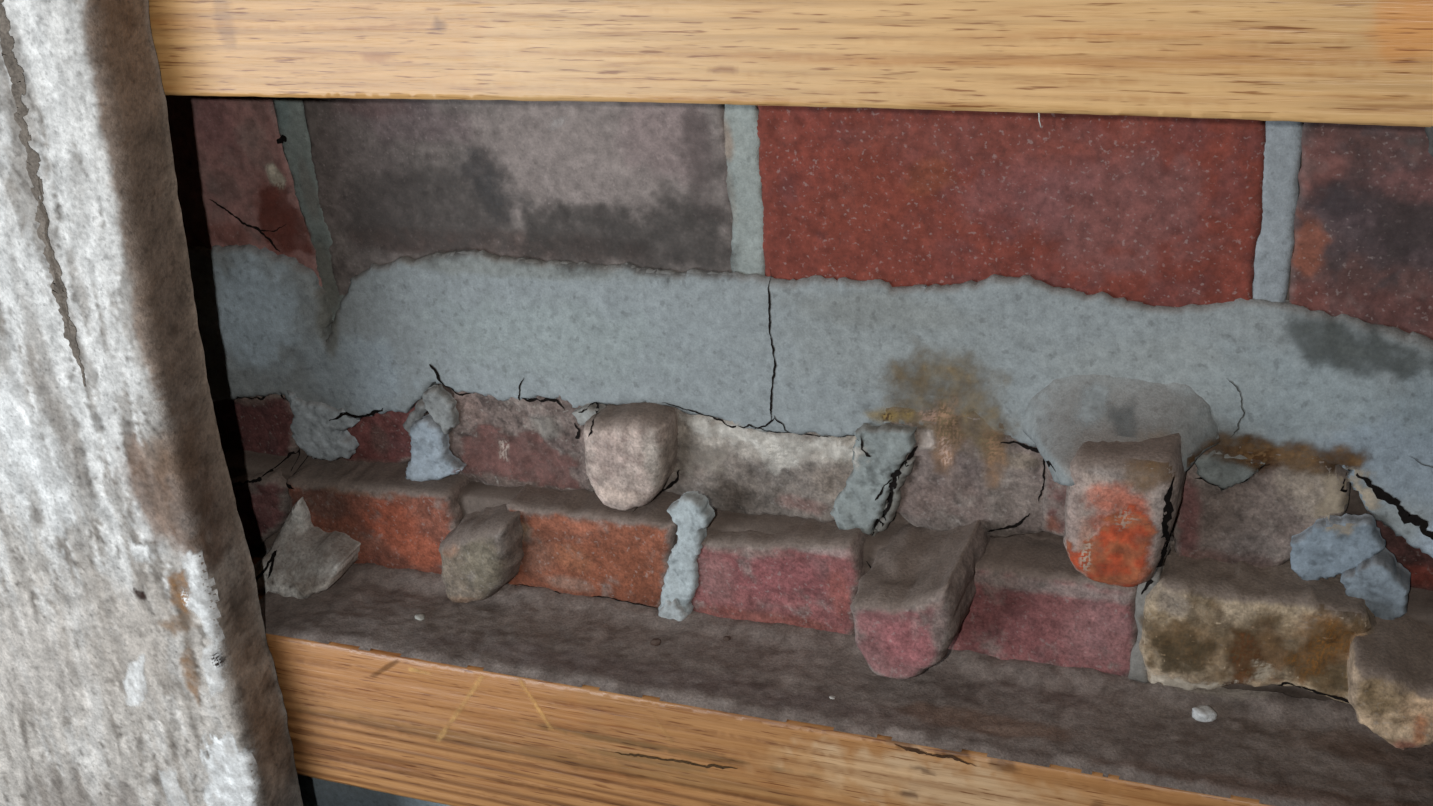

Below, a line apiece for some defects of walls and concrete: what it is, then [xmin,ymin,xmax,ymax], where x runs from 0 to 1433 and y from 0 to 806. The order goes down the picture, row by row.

crack [209,199,286,252]
peeling [254,497,361,599]
peeling [287,390,360,461]
peeling [403,384,579,489]
peeling [658,491,715,621]
crack [666,271,918,568]
peeling [830,422,917,536]
spalling [1067,505,1156,587]
peeling [1290,513,1411,620]
crack [1340,469,1433,540]
leakage [1148,616,1365,691]
spalling [1192,705,1217,722]